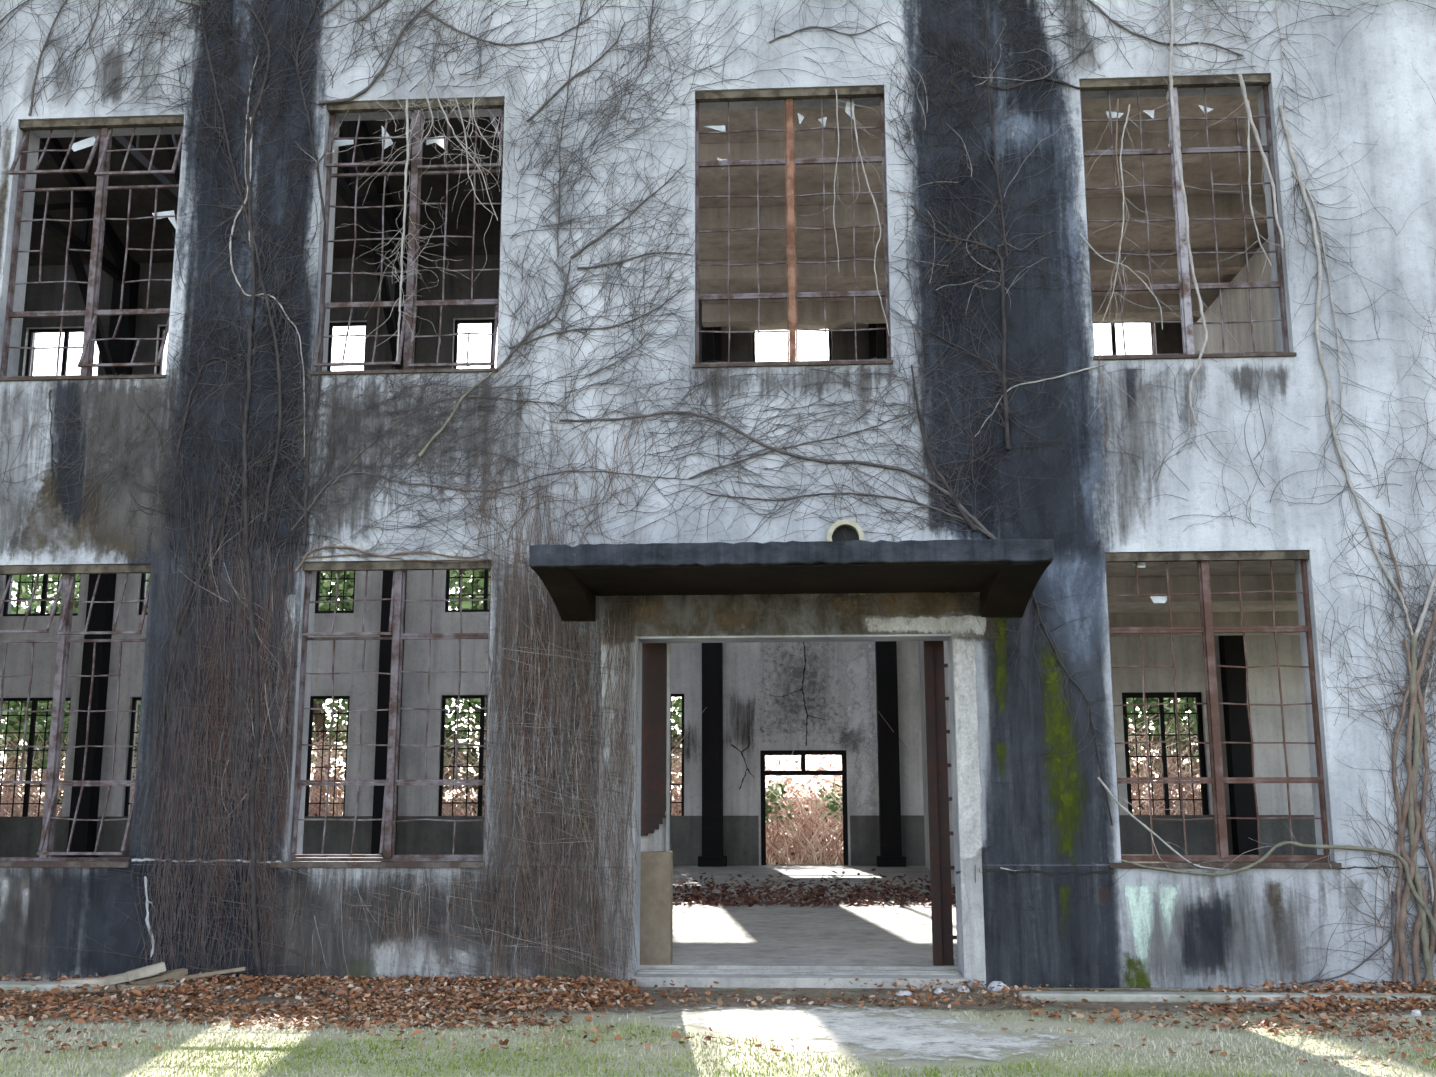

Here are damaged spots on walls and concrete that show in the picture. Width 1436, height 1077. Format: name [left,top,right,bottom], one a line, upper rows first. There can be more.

water stain [0,0,598,984]
crack [772,642,833,747]
water stain [904,0,1307,988]